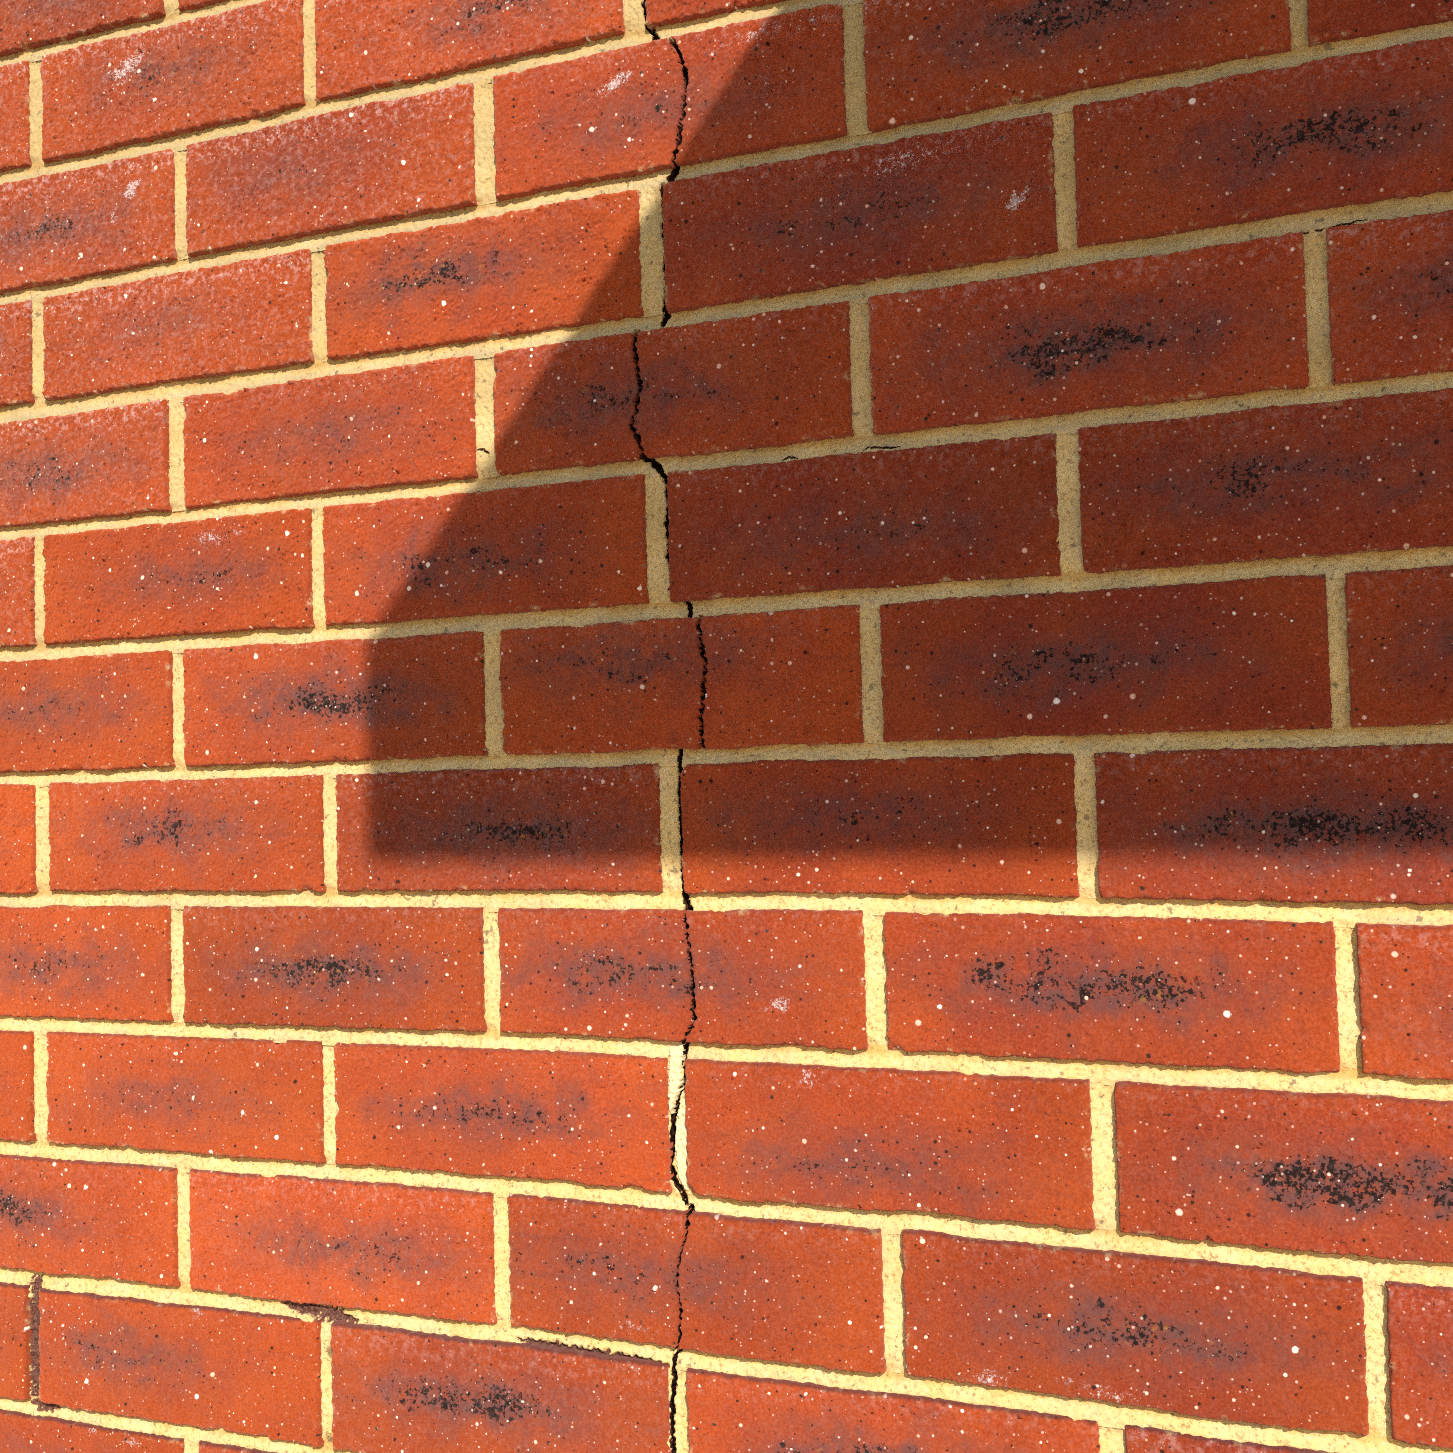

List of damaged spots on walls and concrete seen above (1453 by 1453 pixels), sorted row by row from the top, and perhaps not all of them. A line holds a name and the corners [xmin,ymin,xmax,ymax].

crack [629,0,708,1453]